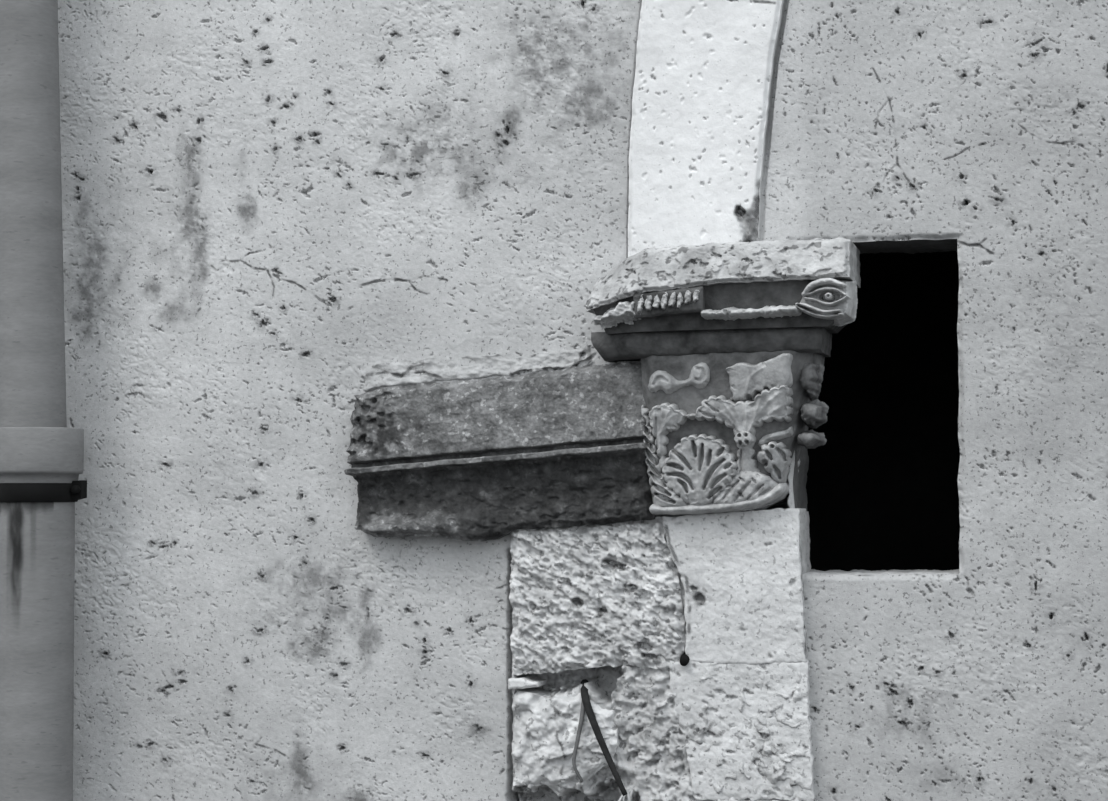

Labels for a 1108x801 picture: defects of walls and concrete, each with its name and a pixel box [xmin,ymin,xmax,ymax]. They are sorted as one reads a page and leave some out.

leakage [520,34,570,95]
leakage [574,80,609,125]
leakage [412,144,432,162]
leakage [74,245,105,333]
crack [231,252,329,306]
crack [363,278,448,294]